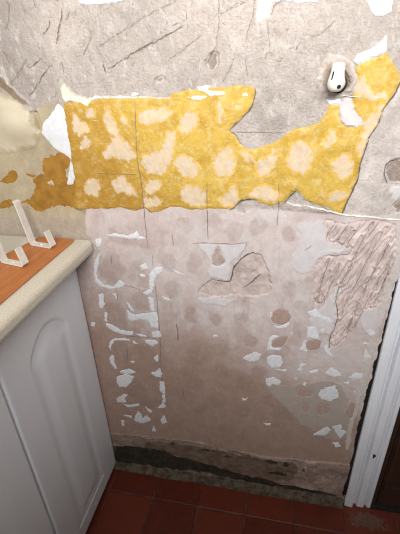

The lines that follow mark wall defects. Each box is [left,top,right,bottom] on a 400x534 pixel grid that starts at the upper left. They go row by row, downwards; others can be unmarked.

peeling [366,0,393,16]
peeling [0,170,18,184]
peeling [21,35,400,357]
peeling [94,230,163,387]
flaking render [243,309,293,372]
peeling [151,368,166,408]
peeling [296,382,340,401]
peeling [117,394,156,432]
peeling [313,424,346,448]
leakage [113,439,338,497]